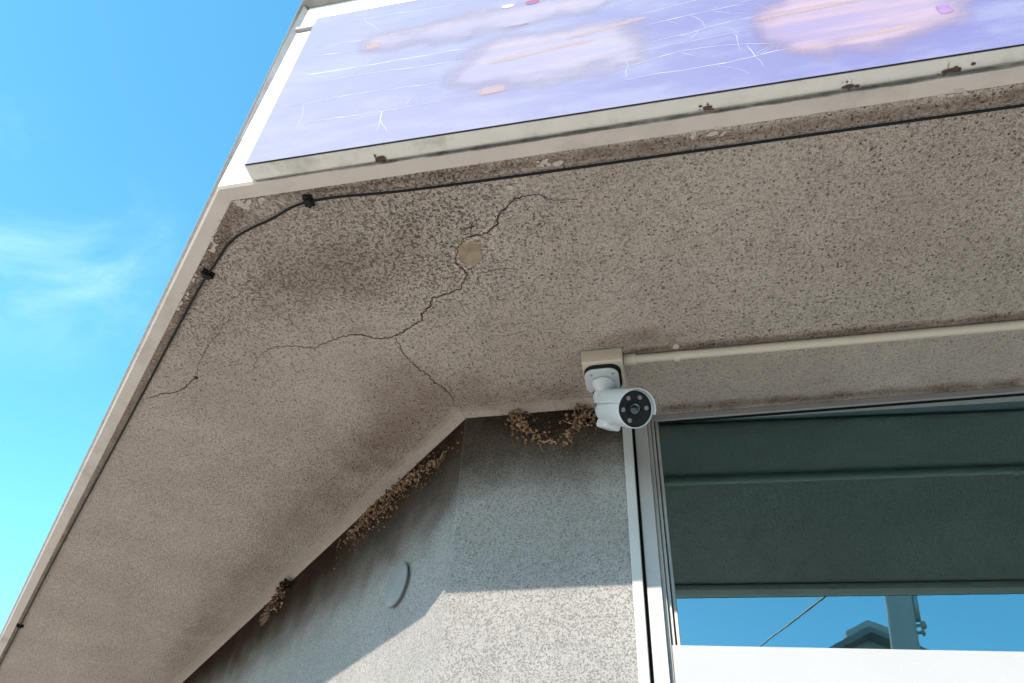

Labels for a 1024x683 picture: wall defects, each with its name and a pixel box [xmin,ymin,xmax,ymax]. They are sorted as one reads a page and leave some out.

crack [148,320,232,399]
crack [253,194,578,405]